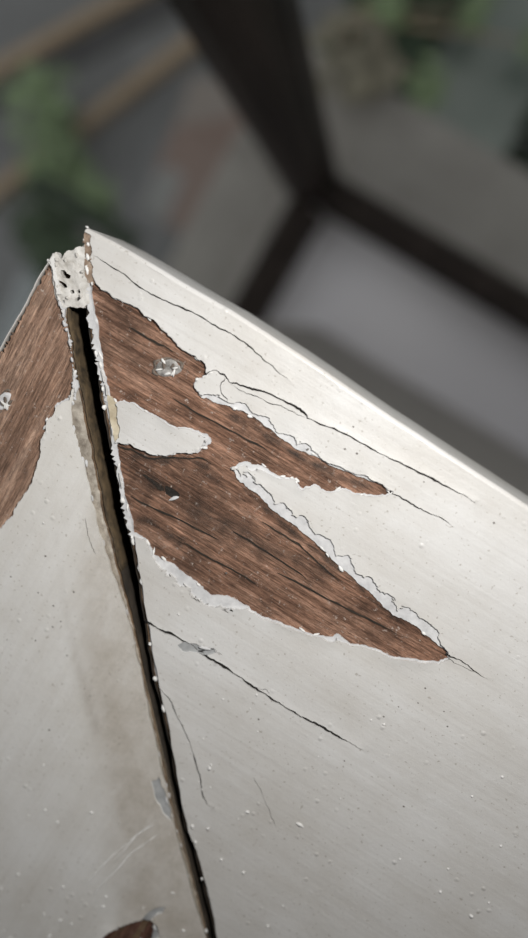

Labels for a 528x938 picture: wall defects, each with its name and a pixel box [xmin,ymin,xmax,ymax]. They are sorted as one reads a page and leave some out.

peeling [0,259,80,529]
crack [67,299,345,938]
peeling [82,226,449,663]
crack [99,258,467,497]
crack [389,491,447,522]
peeling [103,907,166,938]